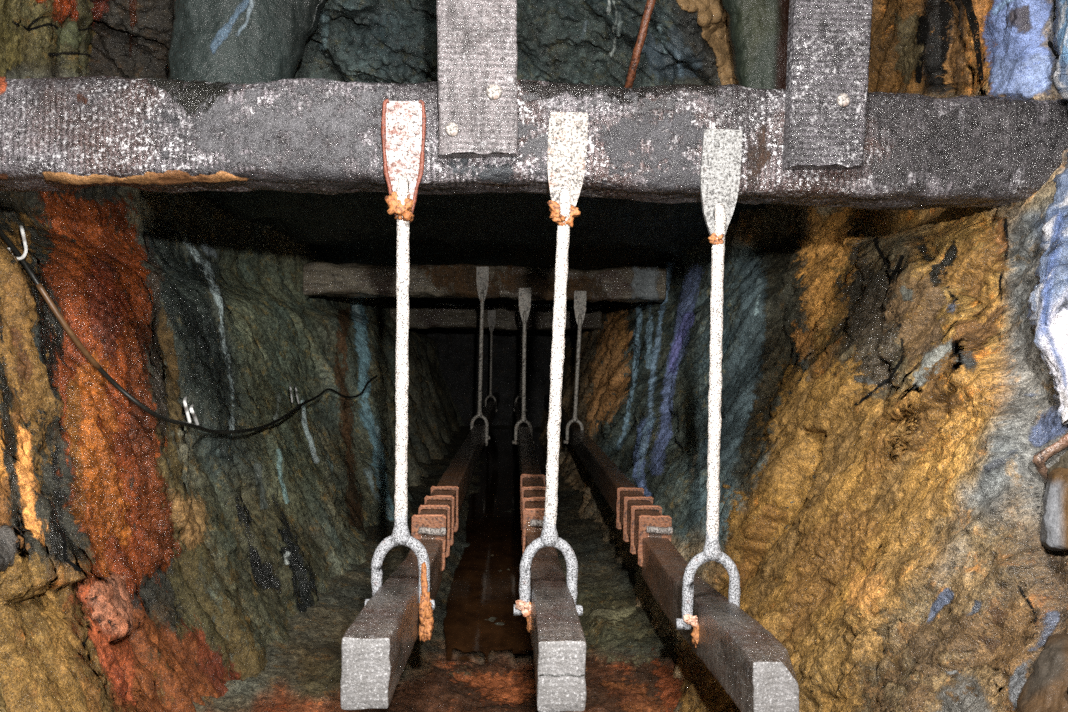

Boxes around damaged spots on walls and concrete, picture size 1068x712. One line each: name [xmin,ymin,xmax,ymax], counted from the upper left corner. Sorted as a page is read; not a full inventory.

rust [36,0,110,30]
rust [381,99,426,223]
rust [547,200,581,227]
rust [418,562,434,642]
rust [515,600,532,634]
rust [683,614,699,648]